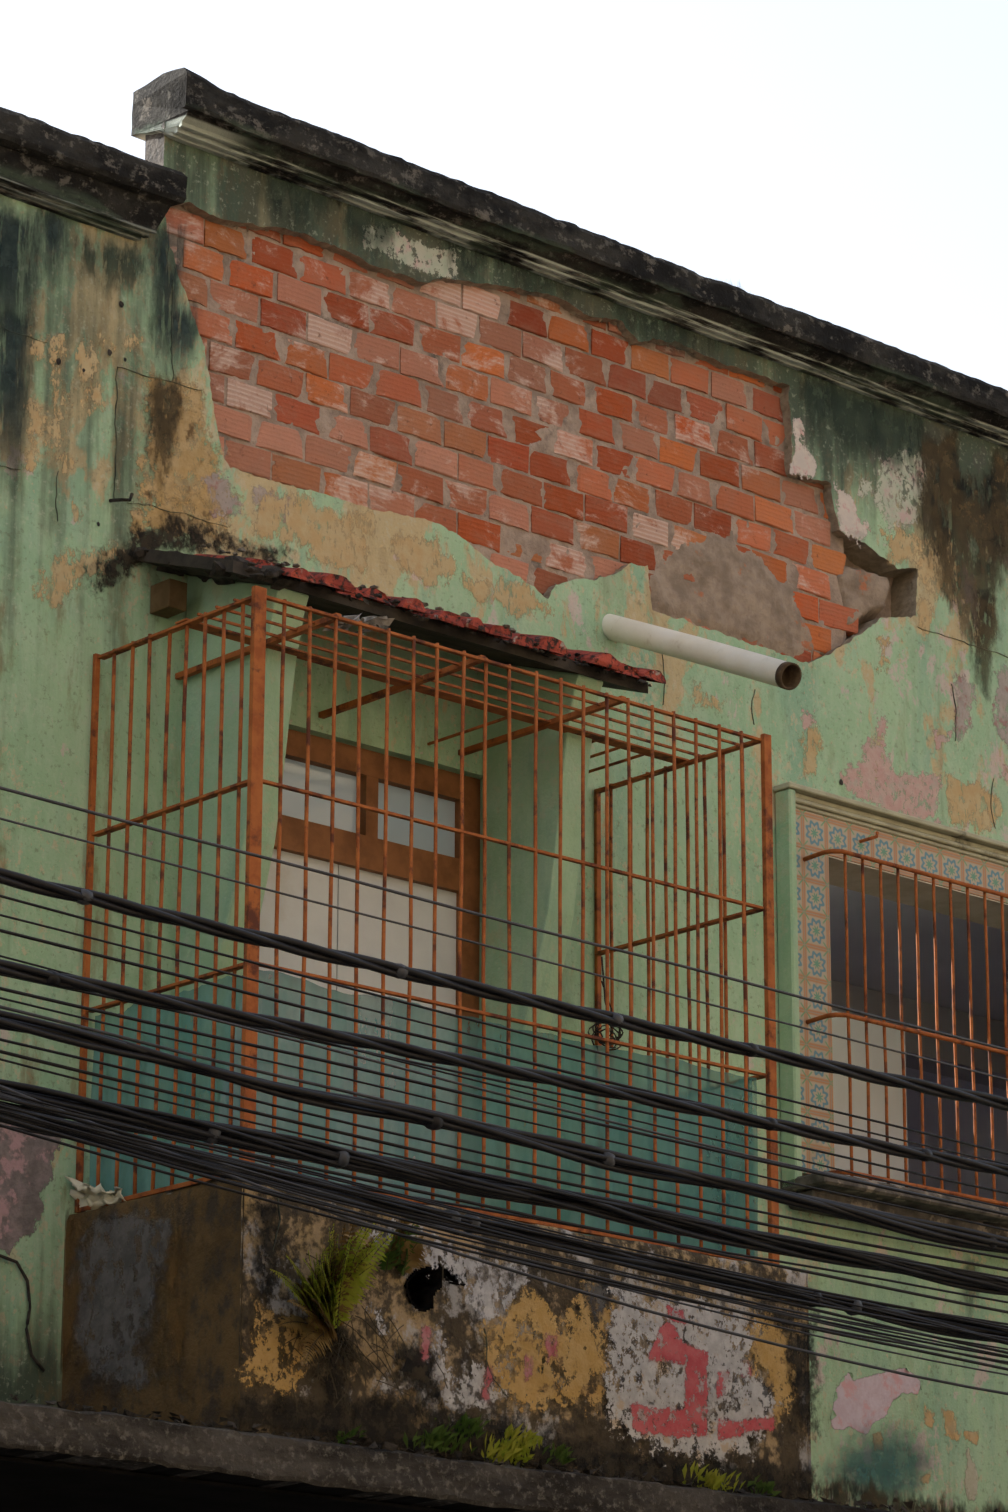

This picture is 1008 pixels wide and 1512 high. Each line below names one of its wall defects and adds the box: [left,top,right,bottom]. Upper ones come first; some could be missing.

water stain [0,209,65,450]
water stain [82,227,198,356]
peeling [21,326,144,474]
water stain [148,379,182,471]
spalling [130,206,957,672]
water stain [801,375,1008,691]
crack [918,627,1008,658]
peeling [839,716,1003,834]
crack [950,684,958,741]
peeling [366,1218,617,1418]
peeling [743,1306,800,1425]
peeling [831,1368,979,1445]